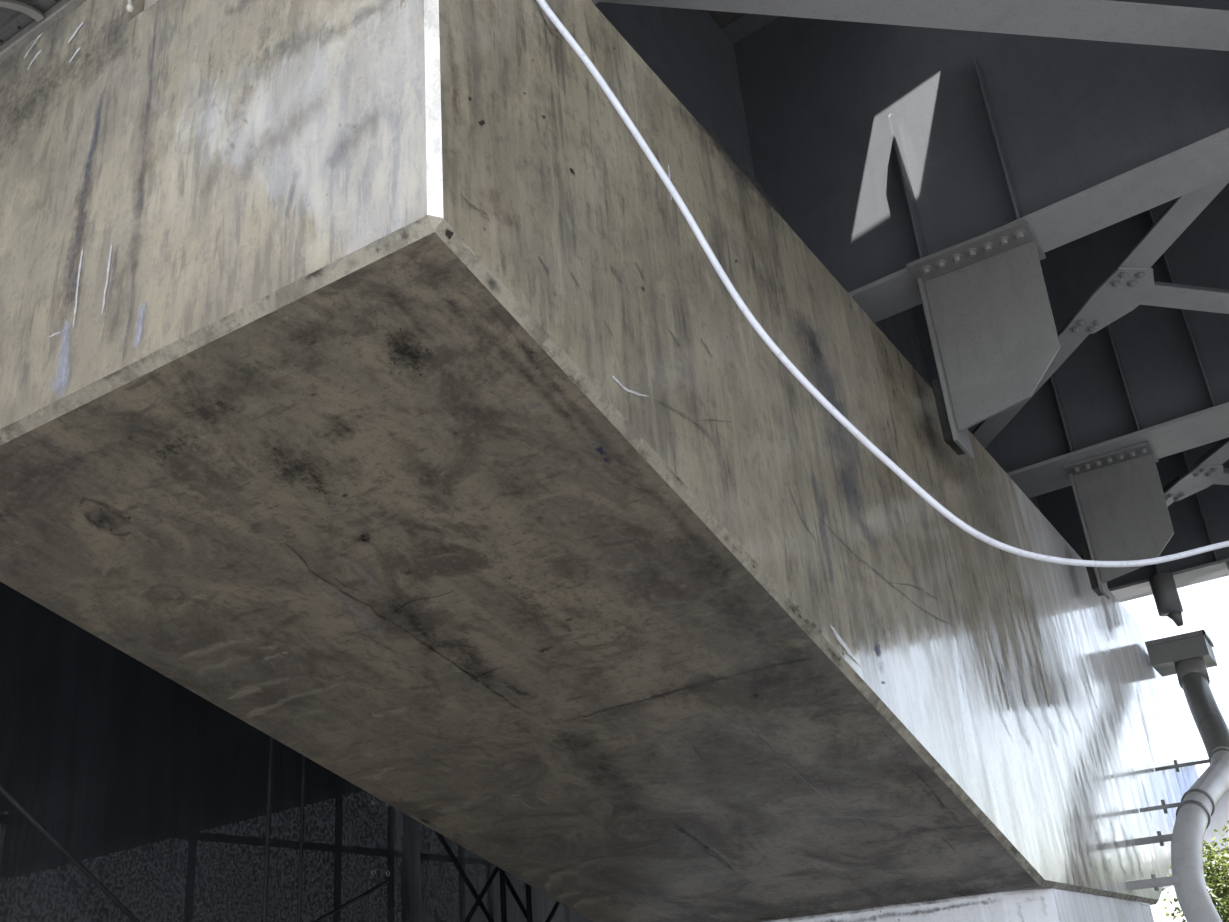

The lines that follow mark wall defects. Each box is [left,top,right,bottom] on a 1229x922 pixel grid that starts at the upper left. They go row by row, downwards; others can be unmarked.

crack [301,558,525,698]